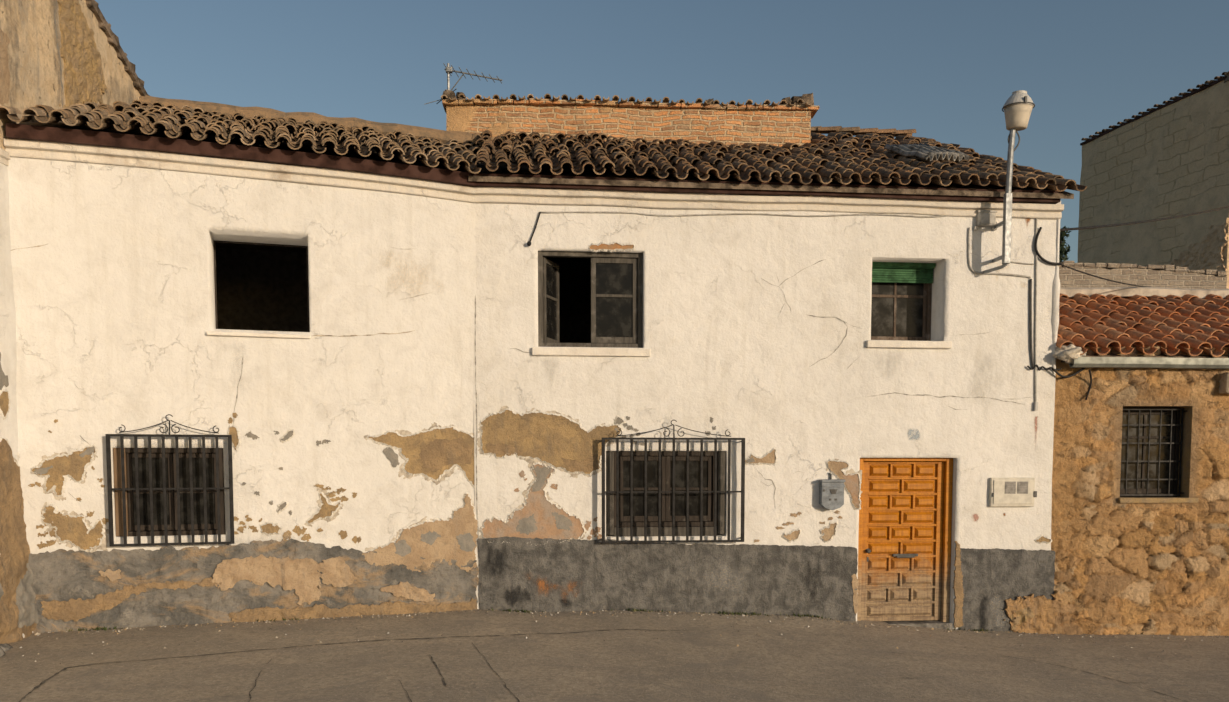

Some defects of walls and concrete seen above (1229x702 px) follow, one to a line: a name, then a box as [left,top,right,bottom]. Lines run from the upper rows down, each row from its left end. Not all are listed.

crack [761,259,863,367]
peeling [0,352,10,420]
crack [868,392,1030,410]
peeling [0,406,644,644]
peeling [776,512,802,543]
peeling [819,459,862,543]